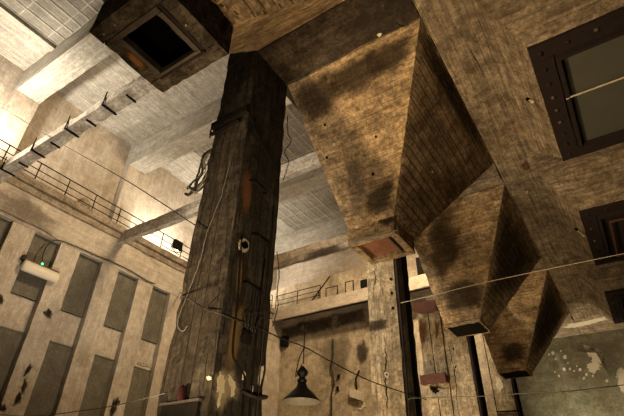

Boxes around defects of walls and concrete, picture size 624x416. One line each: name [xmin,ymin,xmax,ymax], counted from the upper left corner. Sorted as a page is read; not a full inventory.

peeling [548,344,604,379]
peeling [206,371,246,407]
peeling [616,367,624,393]